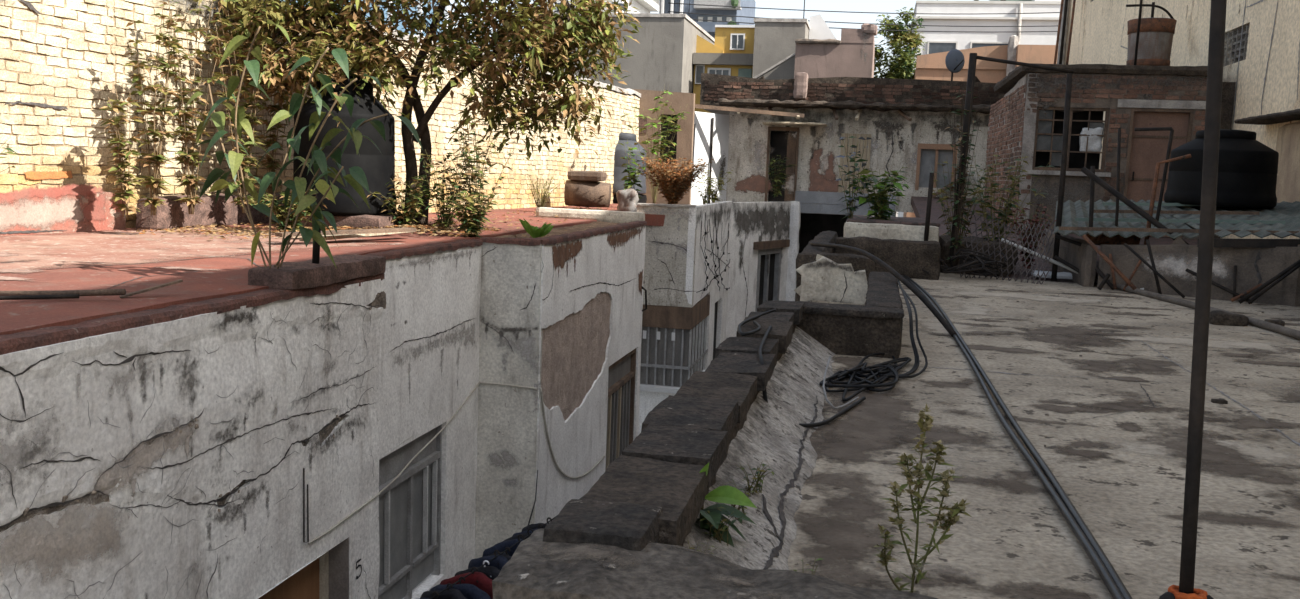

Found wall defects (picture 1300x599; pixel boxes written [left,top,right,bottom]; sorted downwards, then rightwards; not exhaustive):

peeling [735,144,846,193]
spalling [552,239,582,278]
crack [521,214,748,316]
peeling [541,292,611,420]
crack [0,302,514,599]
crack [762,395,818,569]